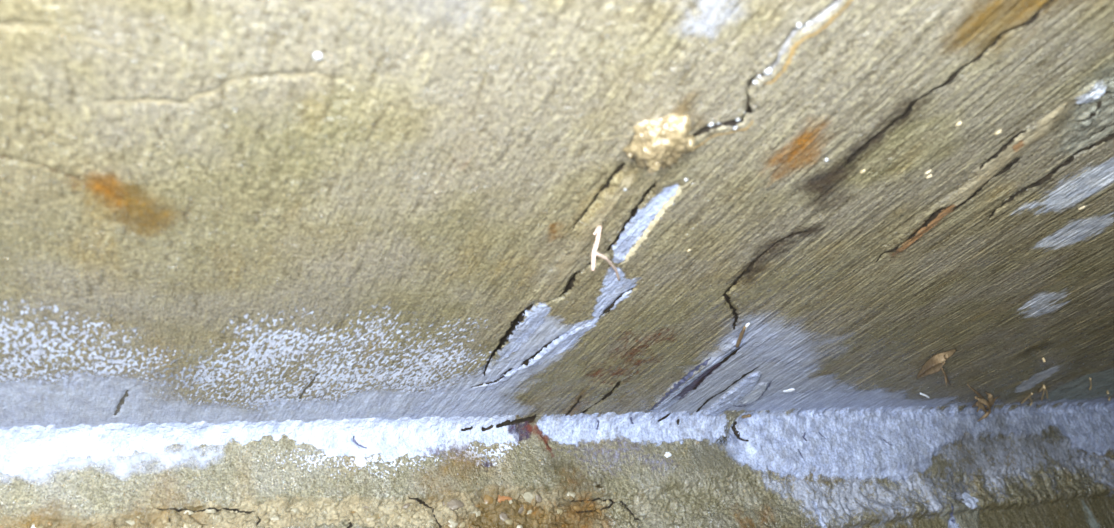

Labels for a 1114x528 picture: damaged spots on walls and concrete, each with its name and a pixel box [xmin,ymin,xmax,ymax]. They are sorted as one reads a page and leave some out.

crack [693,0,852,149]
crack [844,0,1053,167]
rust [93,178,171,230]
crack [564,135,630,230]
crack [560,182,657,296]
water stain [623,113,696,173]
crack [723,231,807,329]
crack [876,123,1114,263]
crack [471,304,559,388]
water stain [0,179,1114,528]
spalling [0,486,640,528]
spalling [942,505,980,528]